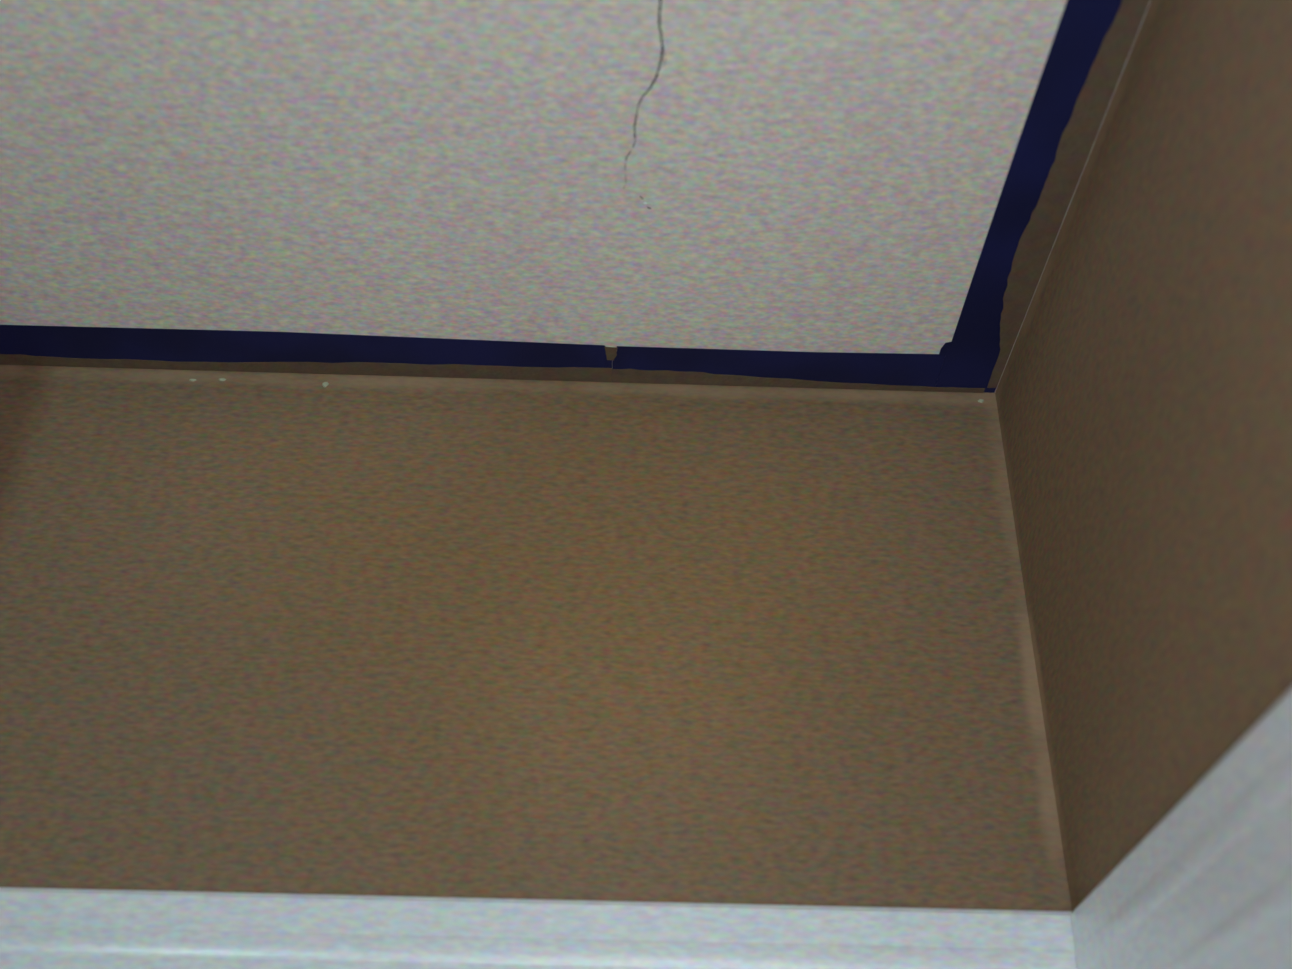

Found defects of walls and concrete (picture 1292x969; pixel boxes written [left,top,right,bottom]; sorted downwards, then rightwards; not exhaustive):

crack [634,0,664,138]